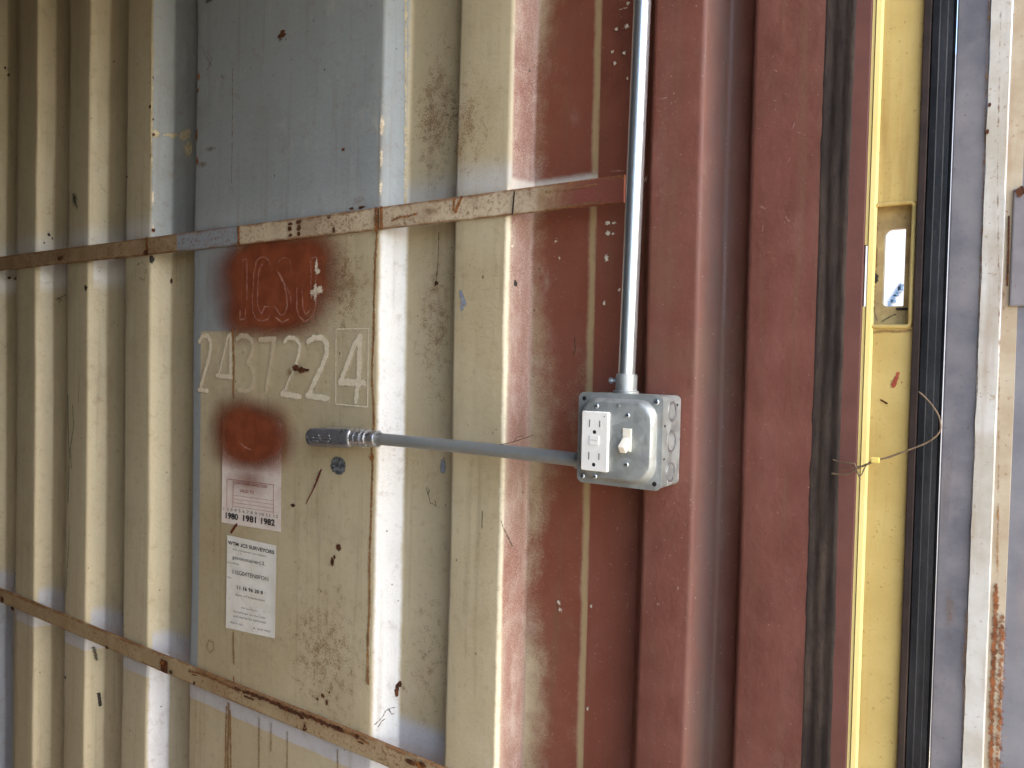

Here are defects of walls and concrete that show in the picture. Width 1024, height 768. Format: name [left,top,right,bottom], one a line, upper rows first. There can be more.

rust [224,703,232,768]
rust [188,671,368,745]
rust [988,584,1006,768]